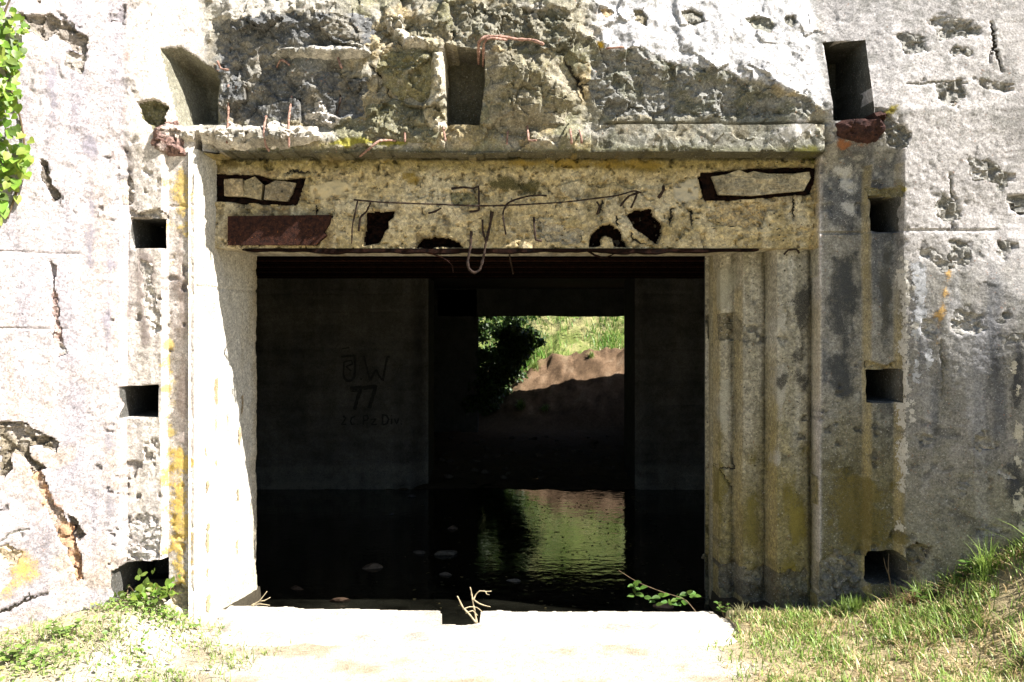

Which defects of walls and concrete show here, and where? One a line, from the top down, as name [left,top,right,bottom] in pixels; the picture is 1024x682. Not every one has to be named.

spalling [633,10,647,26]
spalling [681,10,704,26]
spalling [745,16,797,33]
spalling [213,0,579,152]
spalling [587,46,816,119]
rust [150,120,187,156]
spalling [359,131,406,157]
rust [833,111,887,151]
damp [716,233,901,496]